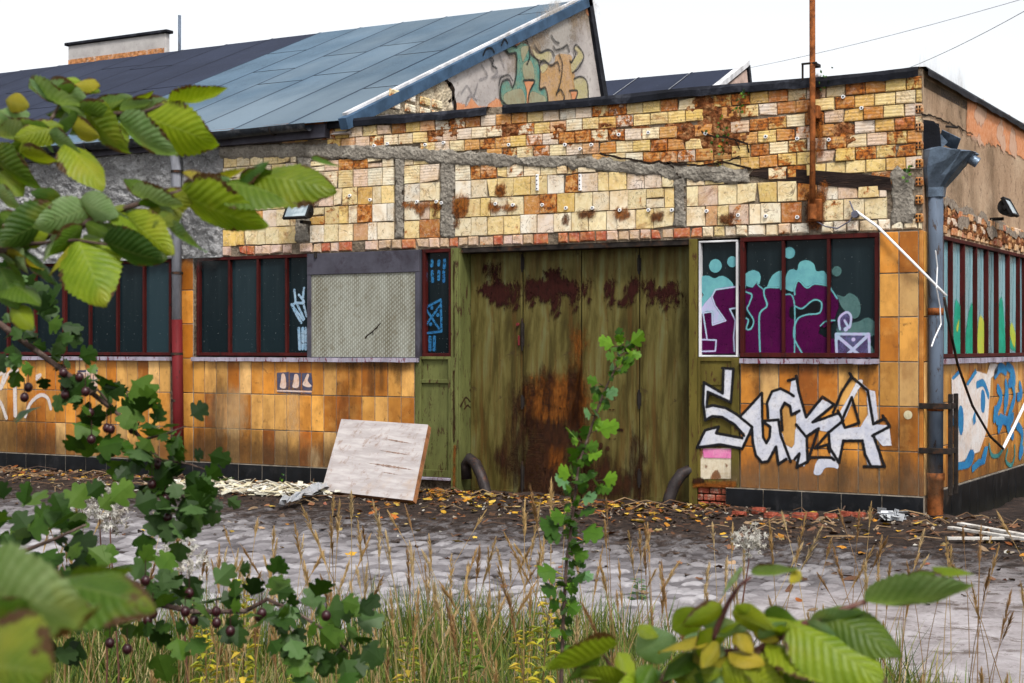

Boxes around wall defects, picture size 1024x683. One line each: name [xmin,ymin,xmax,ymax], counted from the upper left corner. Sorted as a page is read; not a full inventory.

crack [445,79,457,110]
rust [807,74,825,157]
peeling [966,98,1024,159]
rust [402,194,470,228]
rust [488,183,518,213]
rust [562,209,596,226]
rust [613,207,630,220]
rust [805,181,828,230]
spalling [943,196,1024,253]
rust [476,260,687,318]
rust [494,332,650,500]